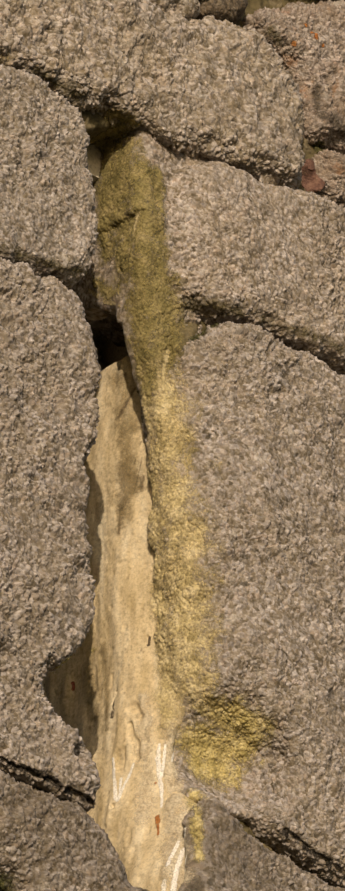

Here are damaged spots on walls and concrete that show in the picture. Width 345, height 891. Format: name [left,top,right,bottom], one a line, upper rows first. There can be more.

leakage [149,166,170,292]
leakage [161,348,170,392]
leakage [118,388,153,436]
crack [0,758,94,804]
crack [282,829,345,871]